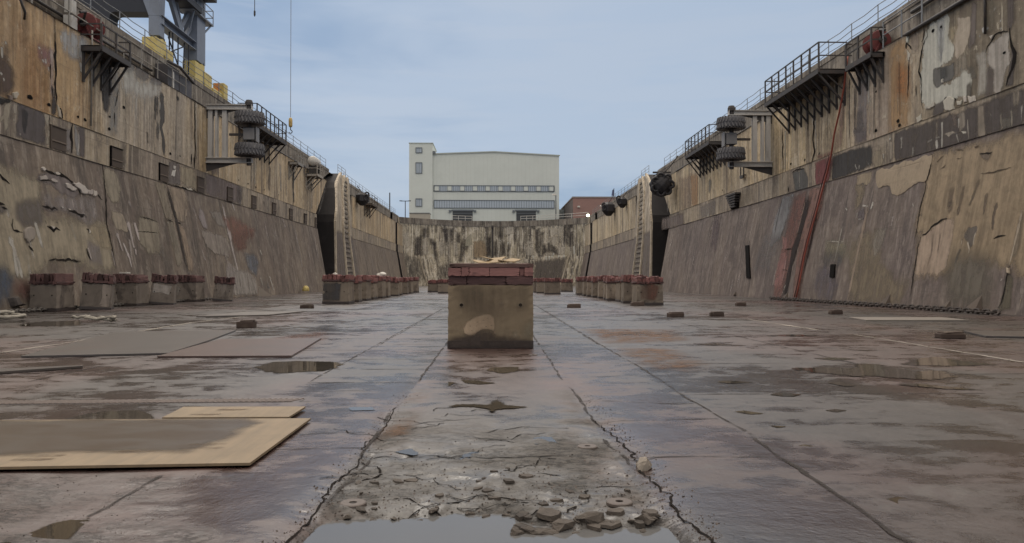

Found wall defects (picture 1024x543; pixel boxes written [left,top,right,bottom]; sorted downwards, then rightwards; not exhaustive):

leakage [102,62,165,155]
peeling [846,13,1024,310]
peeling [0,162,231,277]
leakage [404,226,468,279]
leakage [532,224,575,279]
rust [774,185,825,298]
crack [910,146,978,295]
peeling [464,315,496,336]
crack [285,406,716,543]